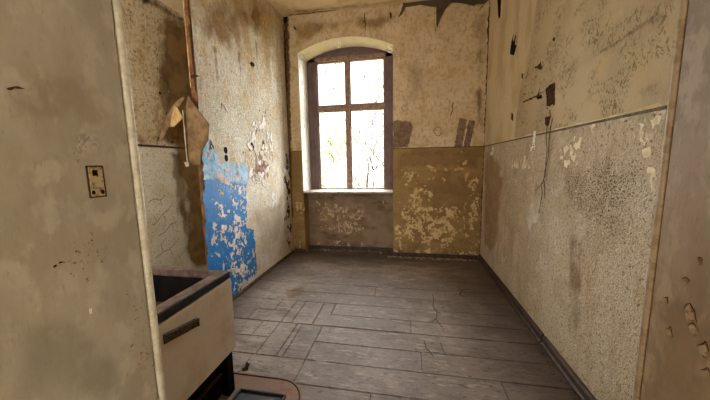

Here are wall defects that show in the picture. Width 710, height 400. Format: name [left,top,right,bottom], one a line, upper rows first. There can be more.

peeling [559,135,582,170]
peeling [634,109,667,158]
peeling [197,113,277,297]
peeling [316,200,364,246]
peeling [392,118,480,255]